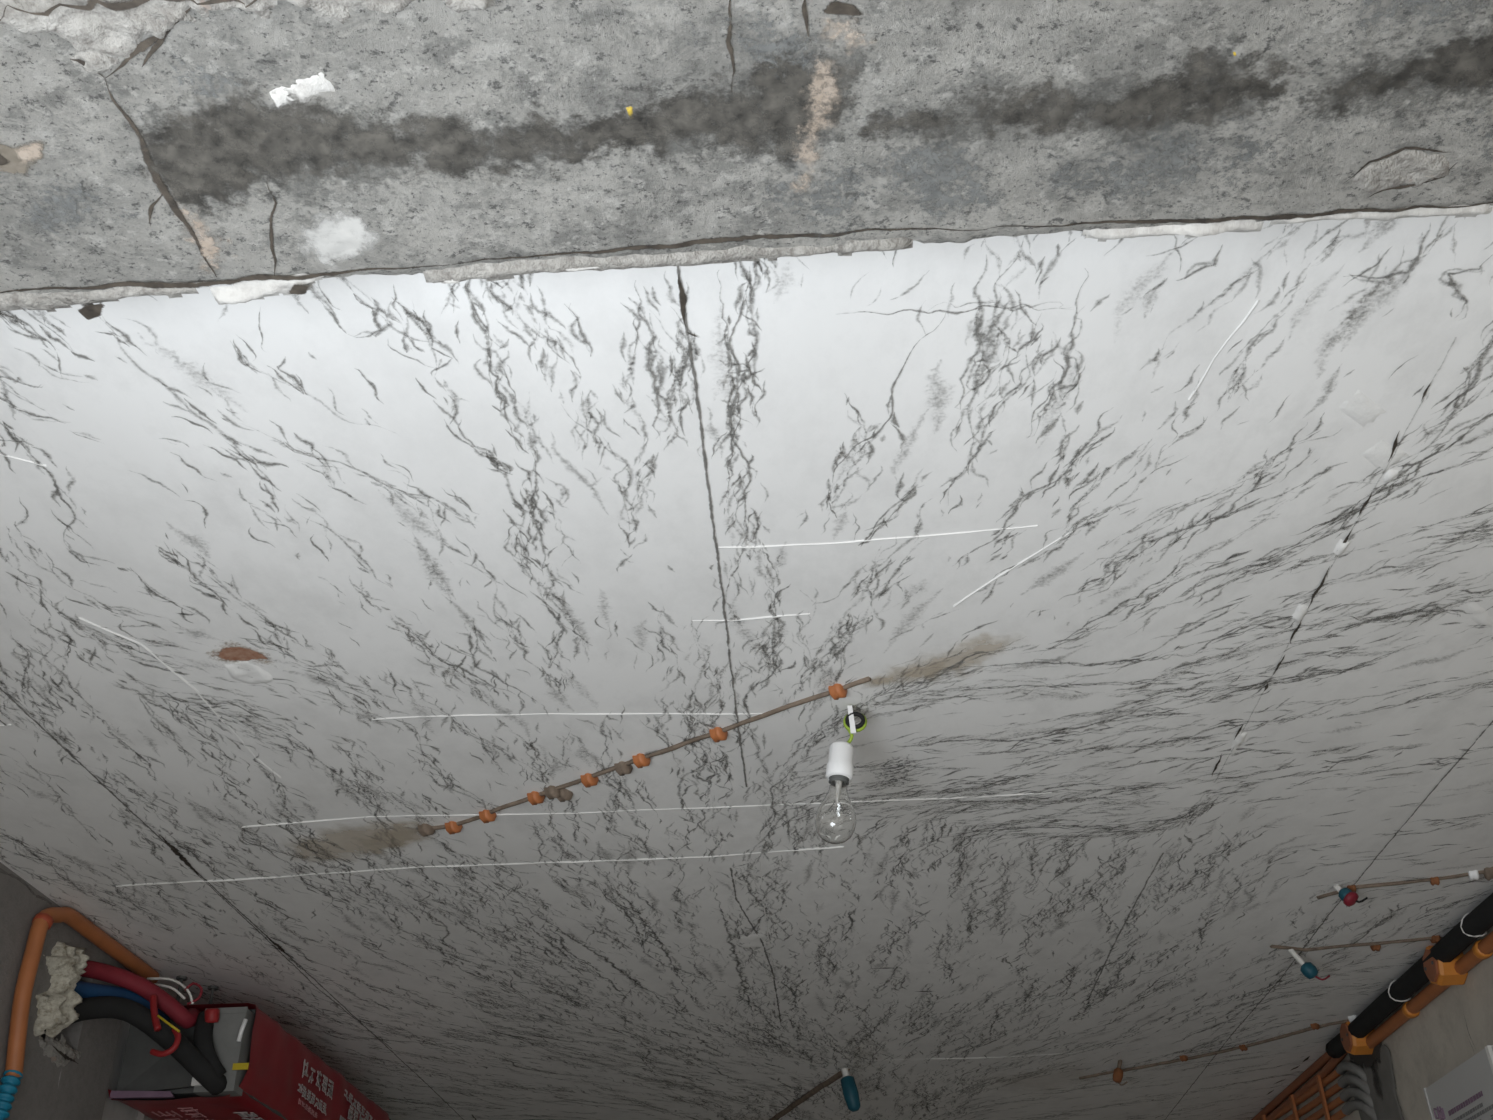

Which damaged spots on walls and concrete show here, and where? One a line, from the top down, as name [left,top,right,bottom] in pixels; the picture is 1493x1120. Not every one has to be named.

spalling [0,0,415,74]
spalling [444,0,500,13]
spalling [823,1,861,44]
water stain [1301,0,1493,160]
spalling [0,142,44,174]
water stain [126,11,1293,236]
crack [0,0,1493,293]
rust [212,642,269,662]